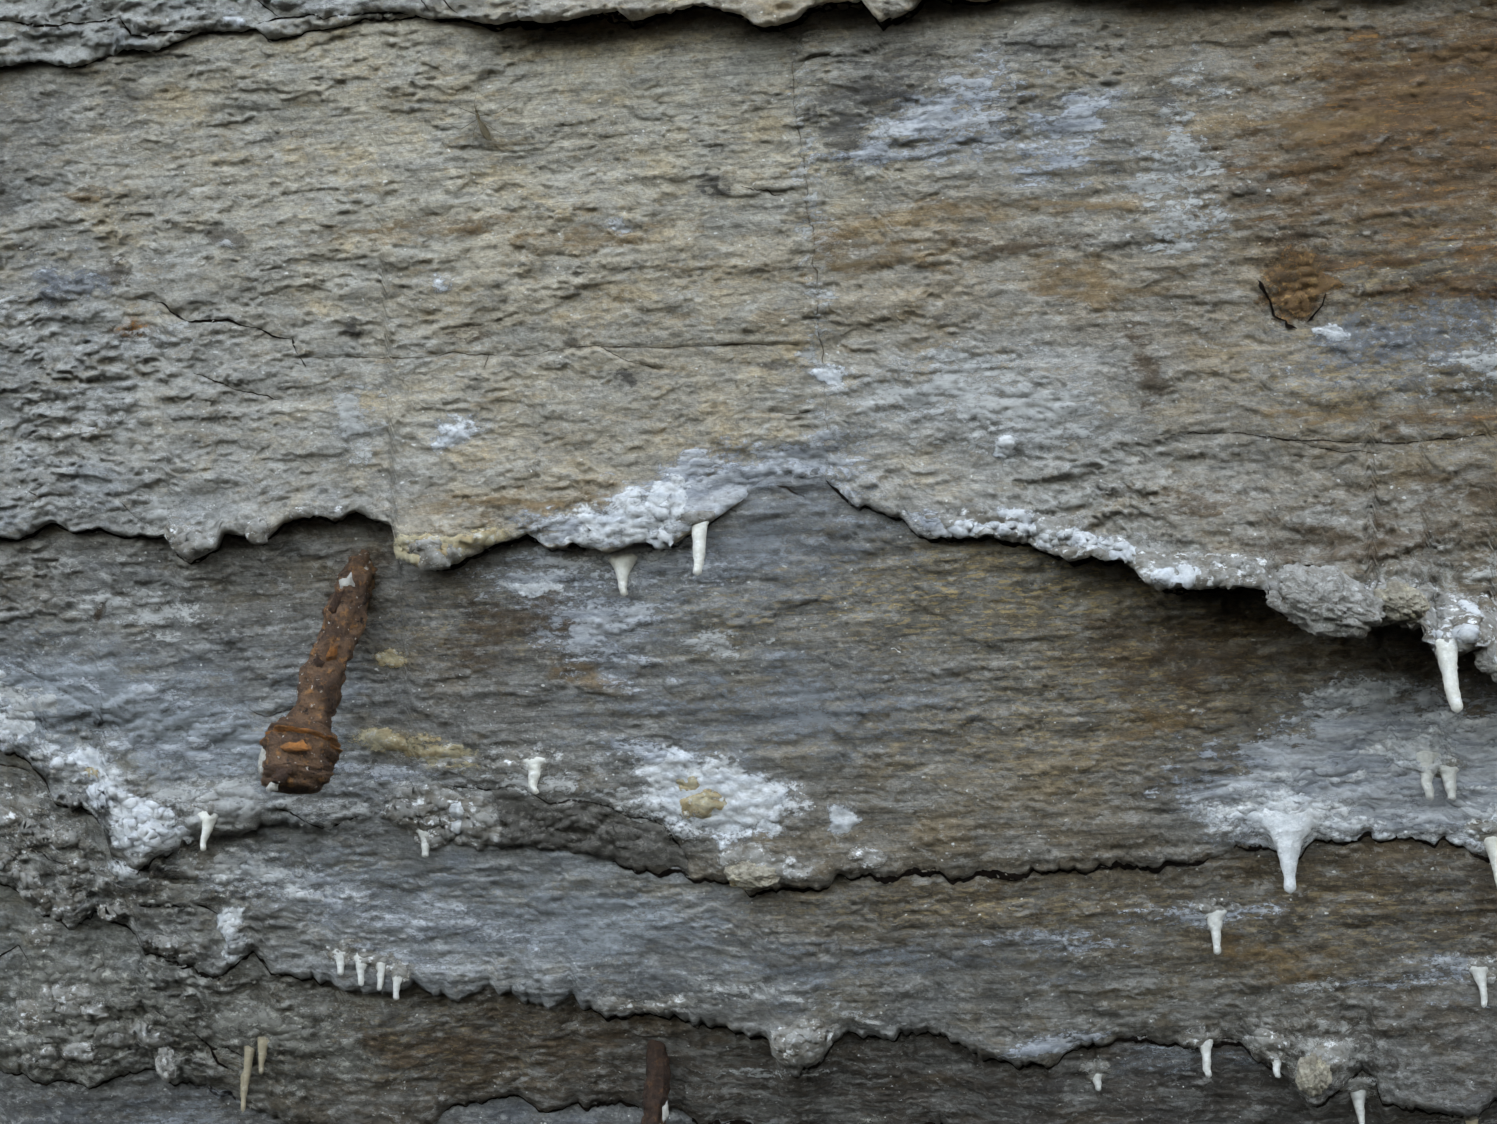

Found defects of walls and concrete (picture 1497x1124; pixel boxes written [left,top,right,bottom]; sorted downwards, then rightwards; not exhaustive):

crack [0,0,1000,443]
crack [0,491,381,565]
crack [410,534,590,571]
crack [777,480,1124,567]
corrosion [328,588,345,614]
corrosion [311,642,339,668]
water stain [0,277,1497,1106]
corrosion [259,725,343,766]
crack [0,750,327,986]
crack [422,782,1490,898]
crack [2,1011,242,1100]
crack [574,995,1284,1079]